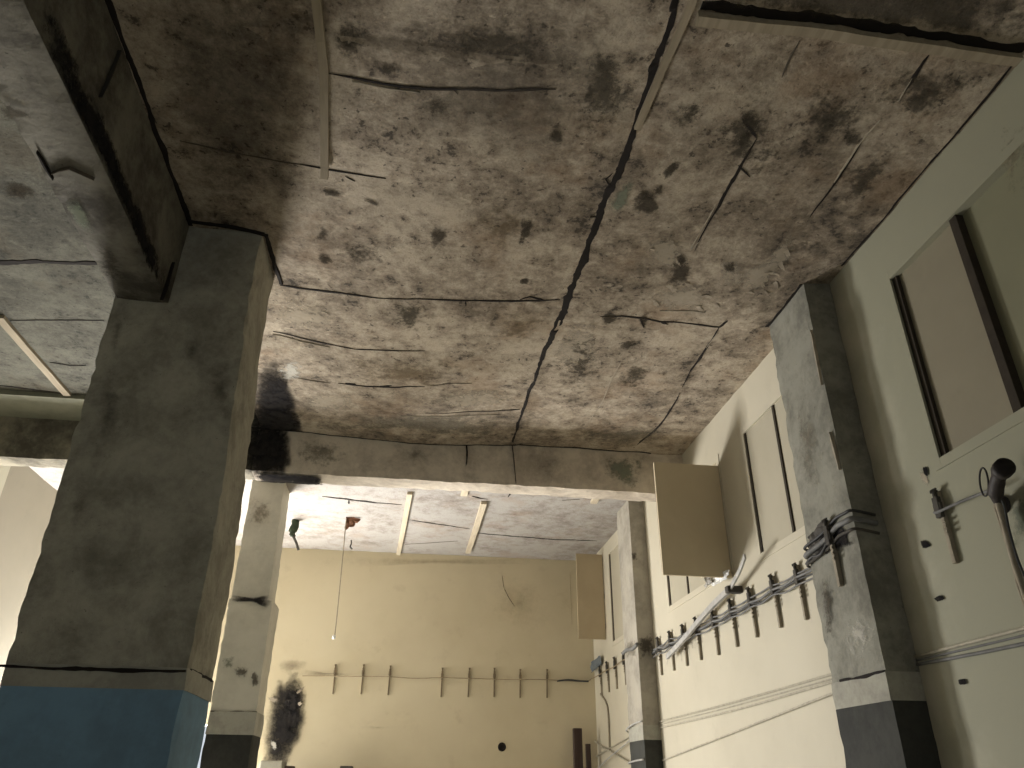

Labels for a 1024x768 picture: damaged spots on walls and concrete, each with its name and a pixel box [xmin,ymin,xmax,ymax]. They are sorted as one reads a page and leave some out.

crack [51,166,95,181]
crack [99,0,1024,499]
crack [0,258,97,266]
leakage [280,362,302,379]
crack [0,664,214,682]
leakage [286,691,298,733]